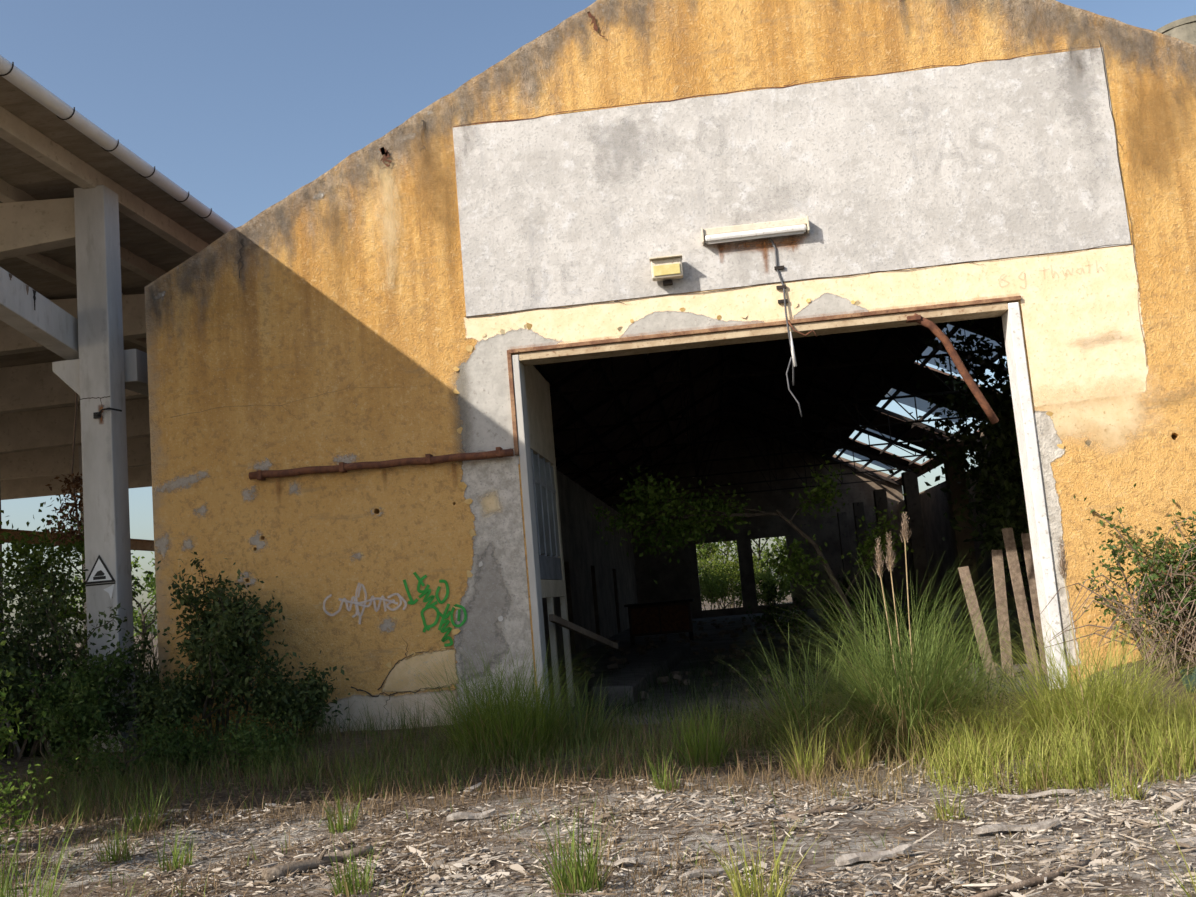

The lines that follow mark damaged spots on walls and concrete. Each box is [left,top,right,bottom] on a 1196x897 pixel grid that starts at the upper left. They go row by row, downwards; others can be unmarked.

peeling [315,245,1149,734]
rust [718,237,801,268]